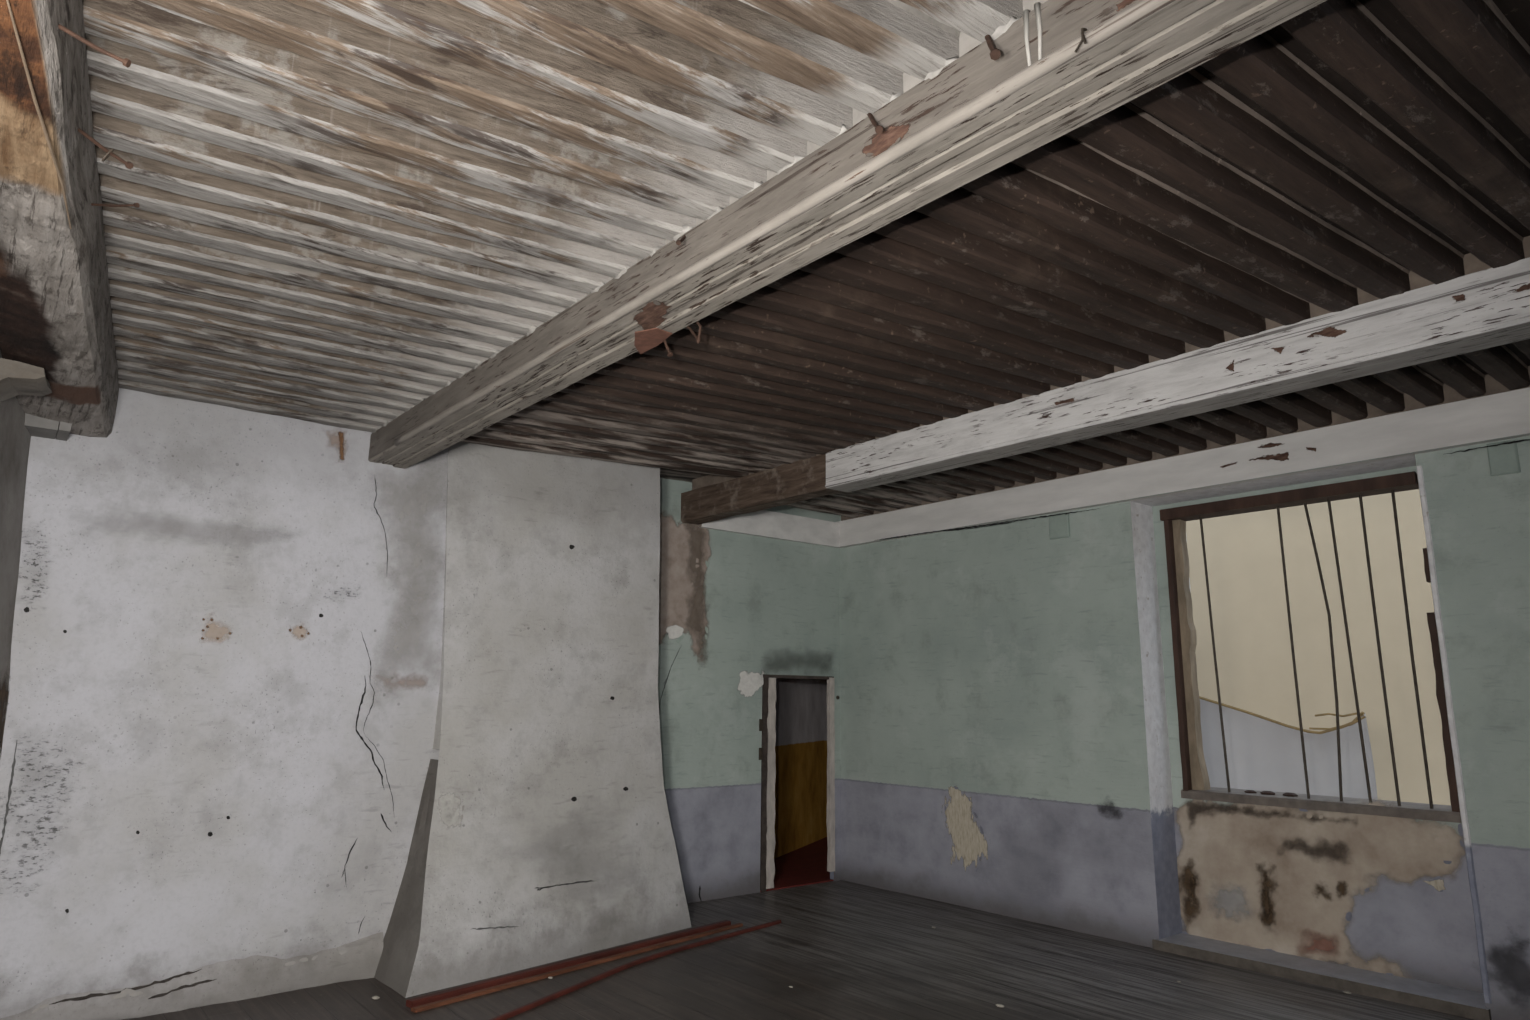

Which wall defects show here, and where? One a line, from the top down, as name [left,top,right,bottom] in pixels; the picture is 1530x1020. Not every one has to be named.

crack [374,480,388,562]
peeling [659,513,711,658]
crack [342,635,394,882]
peeling [945,786,988,872]
peeling [1177,799,1465,978]
damp [1489,942,1530,996]